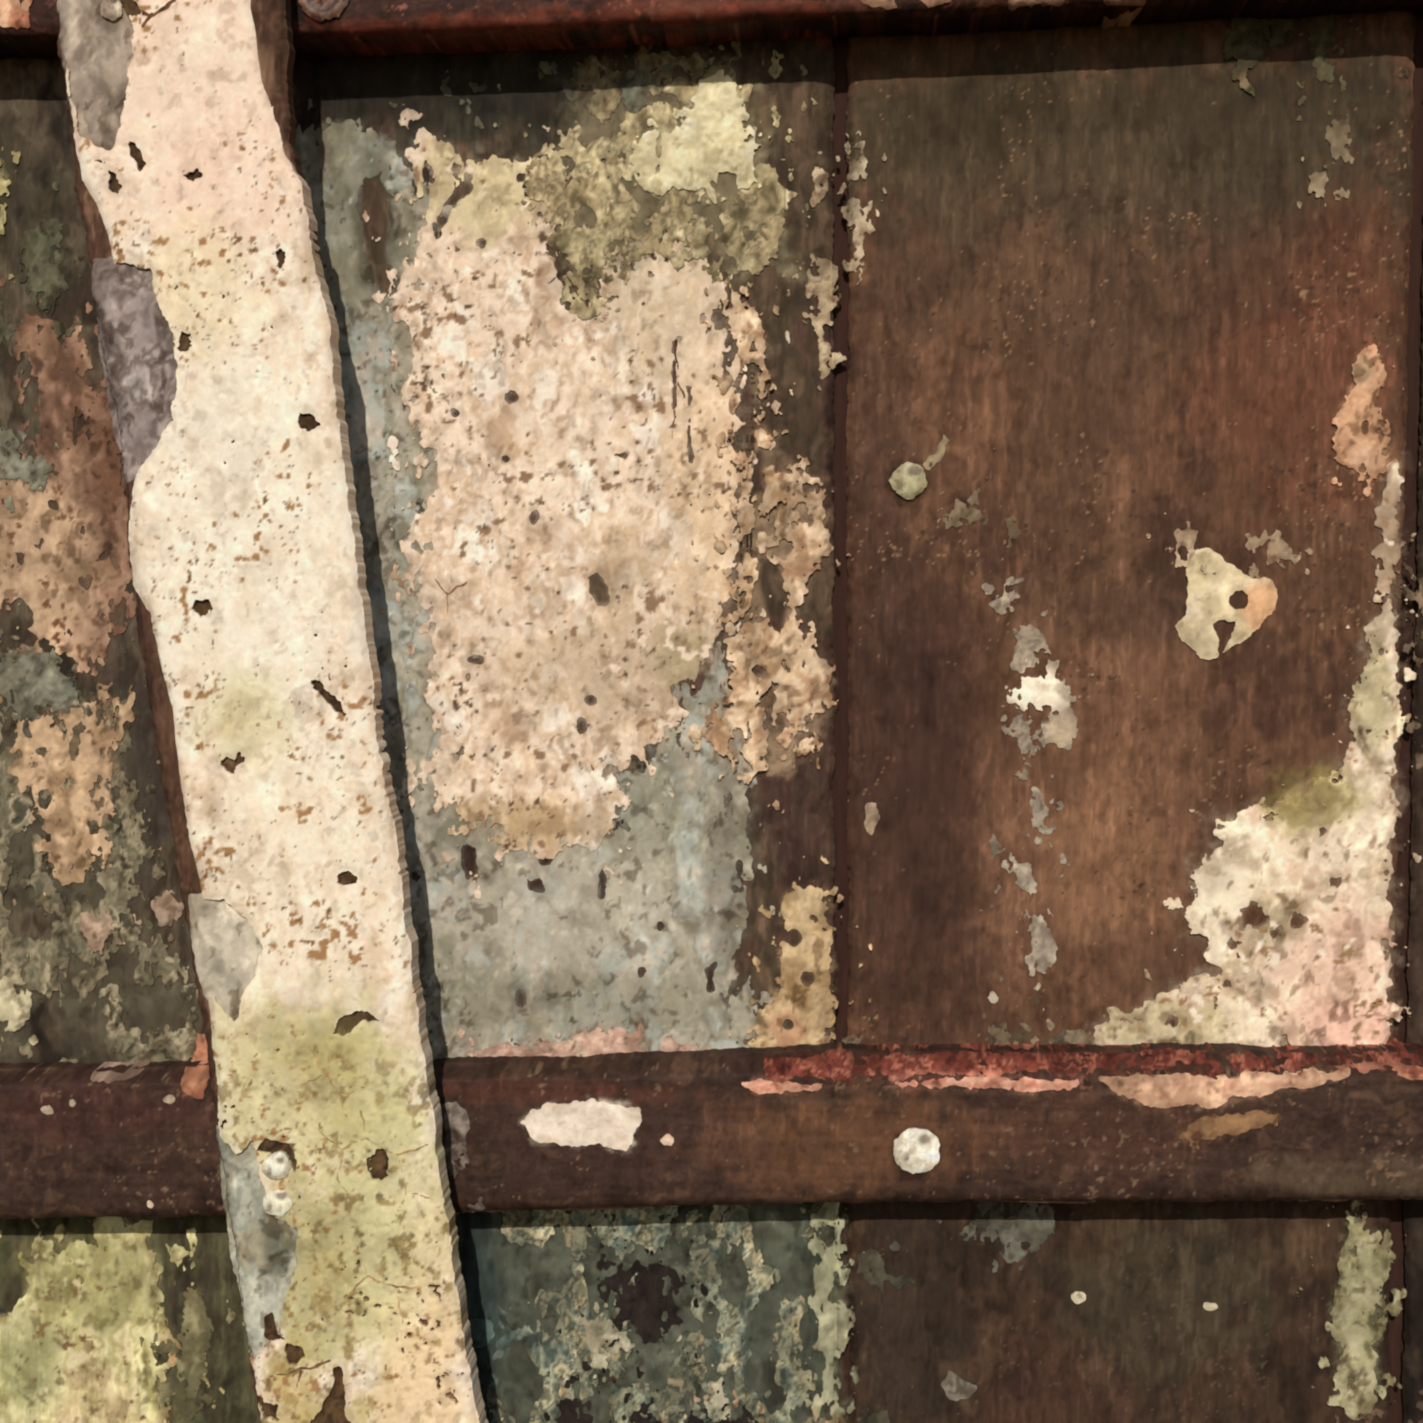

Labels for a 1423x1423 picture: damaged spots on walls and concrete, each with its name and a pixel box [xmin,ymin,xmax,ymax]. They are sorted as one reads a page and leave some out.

peeling [57,0,146,171]
peeling [0,147,21,235]
peeling [109,171,122,194]
peeling [185,169,203,181]
peeling [0,218,263,1104]
peeling [294,41,1423,1151]
peeling [41,1099,76,1115]
peeling [441,1101,470,1179]
peeling [0,1125,305,1423]
peeling [455,1196,916,1423]
peeling [1311,1200,1407,1423]
peeling [1407,1388,1423,1423]